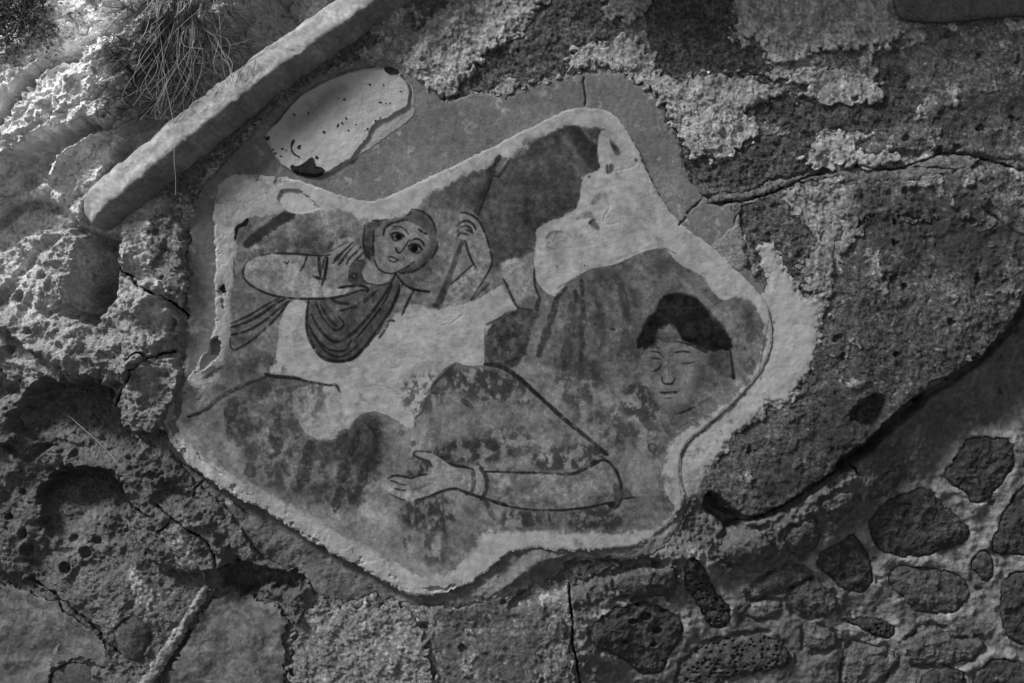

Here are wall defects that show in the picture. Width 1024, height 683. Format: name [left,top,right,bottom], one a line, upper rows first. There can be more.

spalling [470,0,625,92]
spalling [646,0,774,79]
crack [850,153,1018,170]
crack [714,188,782,205]
crack [119,266,190,317]
crack [125,495,216,560]
crack [568,588,580,683]